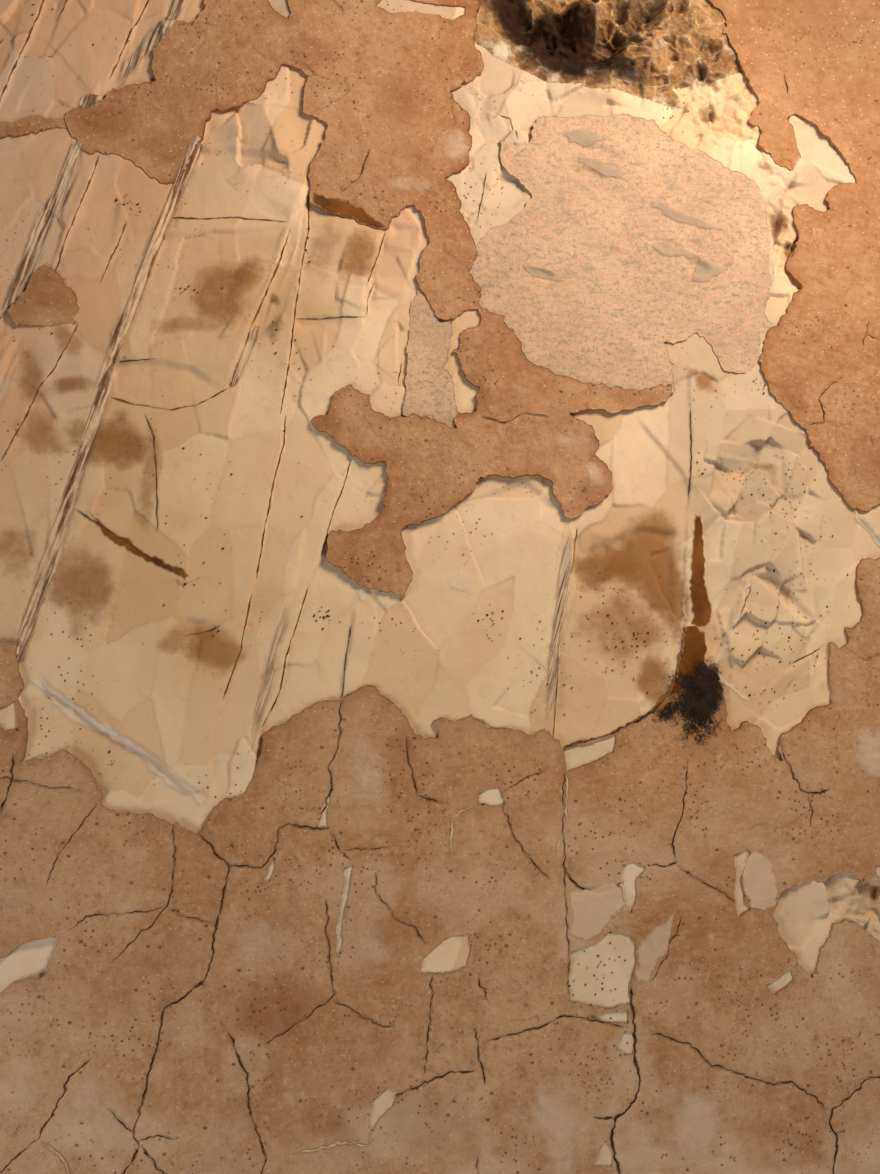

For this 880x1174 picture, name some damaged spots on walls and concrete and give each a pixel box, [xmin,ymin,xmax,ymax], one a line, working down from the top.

spalling [0,0,880,833]
corrosion [581,516,711,700]
crack [0,754,95,881]
spalling [0,937,59,993]
crack [69,705,424,1174]
spalling [336,865,354,954]
spalling [420,933,471,973]
spalling [620,861,646,913]
crack [393,697,880,1174]
spalling [734,848,750,916]
spalling [766,865,880,994]
crack [0,1059,90,1174]